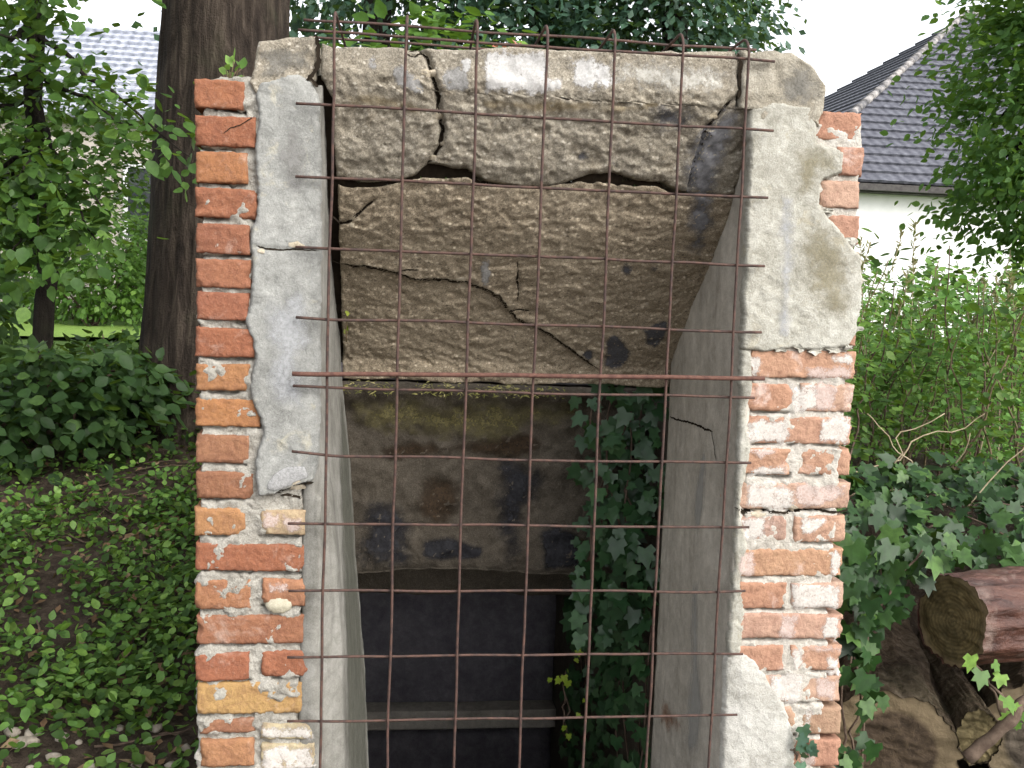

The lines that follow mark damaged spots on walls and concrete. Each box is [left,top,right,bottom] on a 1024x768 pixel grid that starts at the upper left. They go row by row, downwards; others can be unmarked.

crack [550,53,743,192]
crack [256,36,599,367]
spalling [268,466,308,491]
water stain [360,504,408,563]
water stain [423,538,482,560]
water stain [457,433,540,554]
water stain [583,336,629,369]
crack [671,417,716,458]
peeling [739,418,846,576]
peeling [774,344,853,446]
peeling [771,550,841,724]
peeling [261,727,317,768]